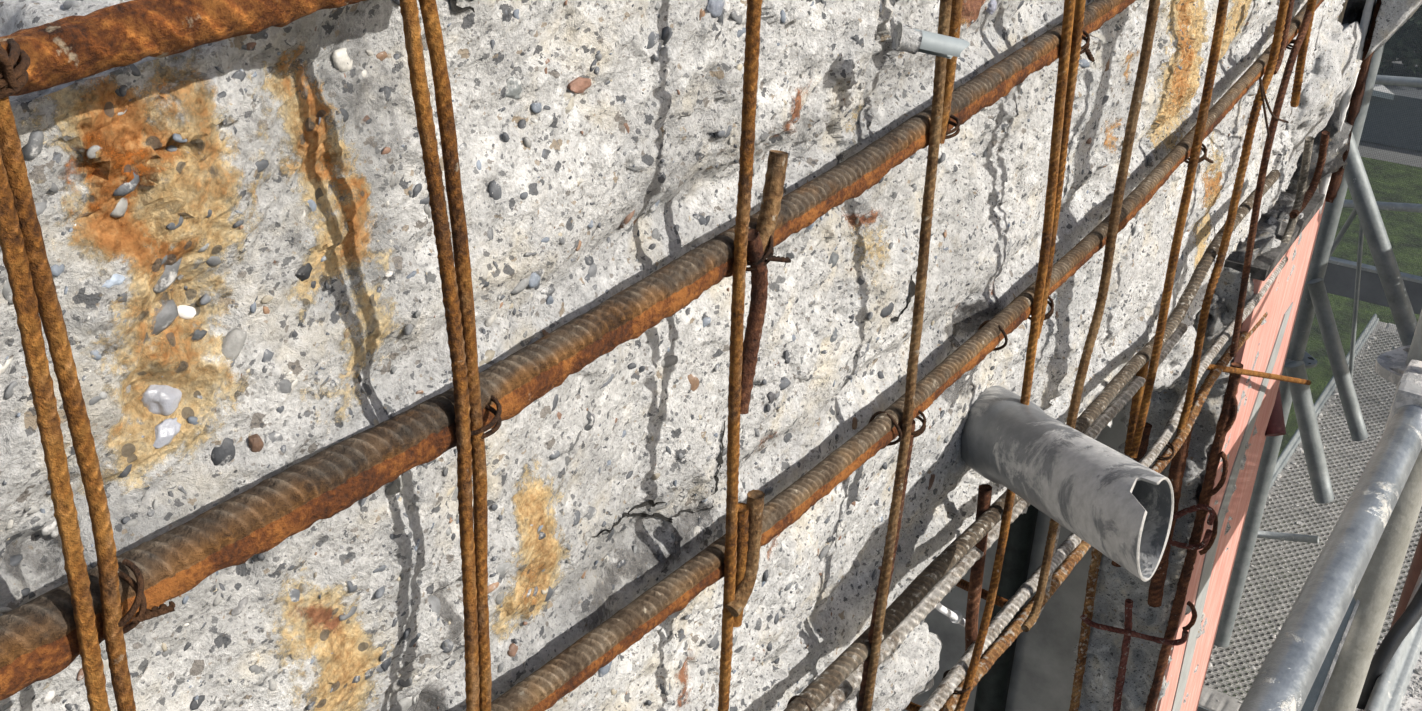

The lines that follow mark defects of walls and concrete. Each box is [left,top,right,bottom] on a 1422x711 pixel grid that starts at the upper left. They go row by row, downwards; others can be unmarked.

corrosion [23,56,263,490]
spalling [138,255,276,377]
corrosion [249,46,399,419]
spalling [476,93,567,178]
spalling [644,2,709,108]
corrosion [1147,0,1256,154]
corrosion [1192,131,1224,268]
spalling [205,438,235,474]
crack [589,420,726,540]
corrosion [492,460,570,639]
spalling [147,672,205,710]
corrosion [272,568,388,711]